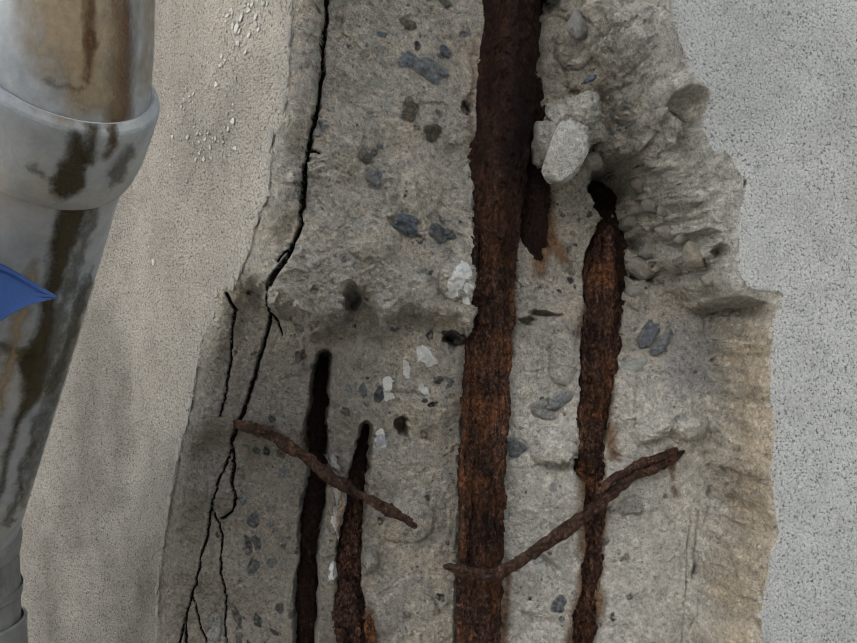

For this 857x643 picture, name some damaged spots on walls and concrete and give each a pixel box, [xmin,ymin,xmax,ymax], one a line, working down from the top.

crack [179,0,329,643]
rust [295,356,329,643]
spalling [155,0,485,643]
rust [331,424,376,643]
rust [455,0,570,643]
rust [565,507,607,643]
rust [574,180,629,511]
spalling [500,0,782,643]